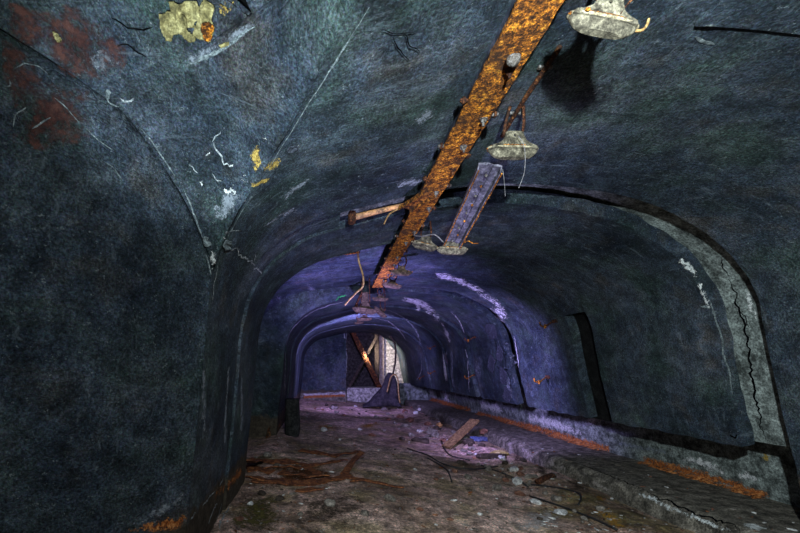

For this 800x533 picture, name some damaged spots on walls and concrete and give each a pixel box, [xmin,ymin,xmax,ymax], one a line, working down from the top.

peeling [159,0,255,67]
efflorescence [214,194,236,218]
rust [413,170,480,247]
rust [459,173,502,249]
crack [721,260,766,440]
rust [429,397,610,451]
rust [130,514,185,532]
crack [577,463,740,531]
rust [638,457,769,499]